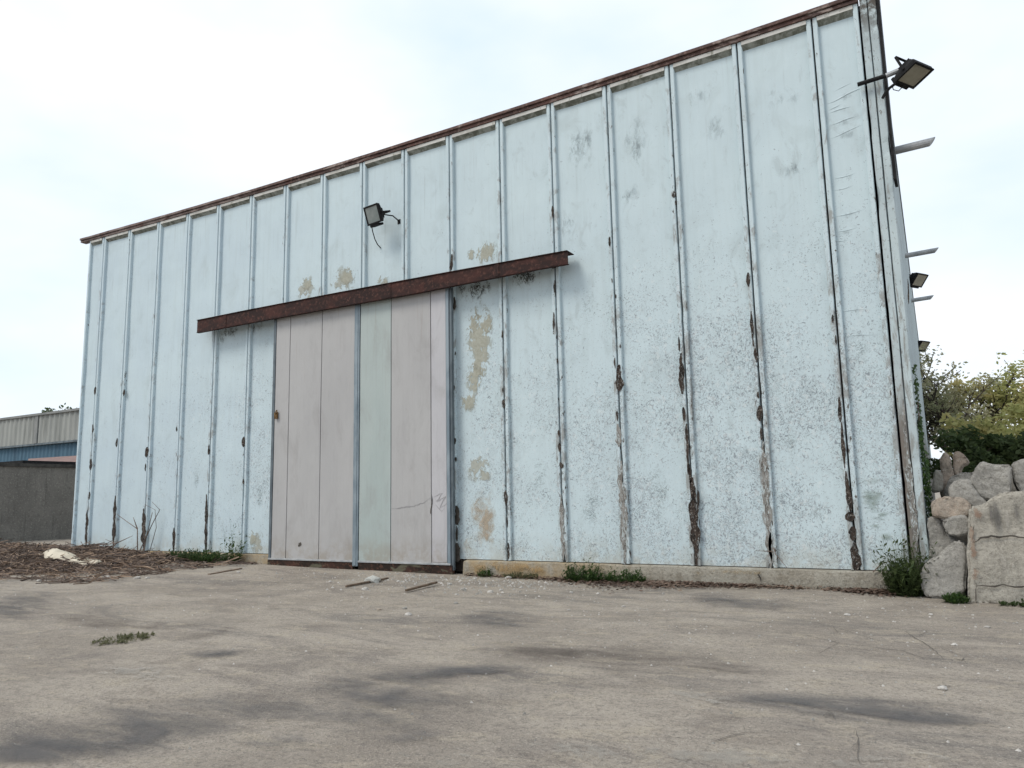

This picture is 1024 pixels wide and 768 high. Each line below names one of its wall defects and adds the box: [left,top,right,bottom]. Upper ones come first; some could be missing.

peeling [468,244,494,262]
peeling [298,277,313,298]
peeling [334,269,353,289]
peeling [454,309,503,410]
peeling [469,456,489,480]